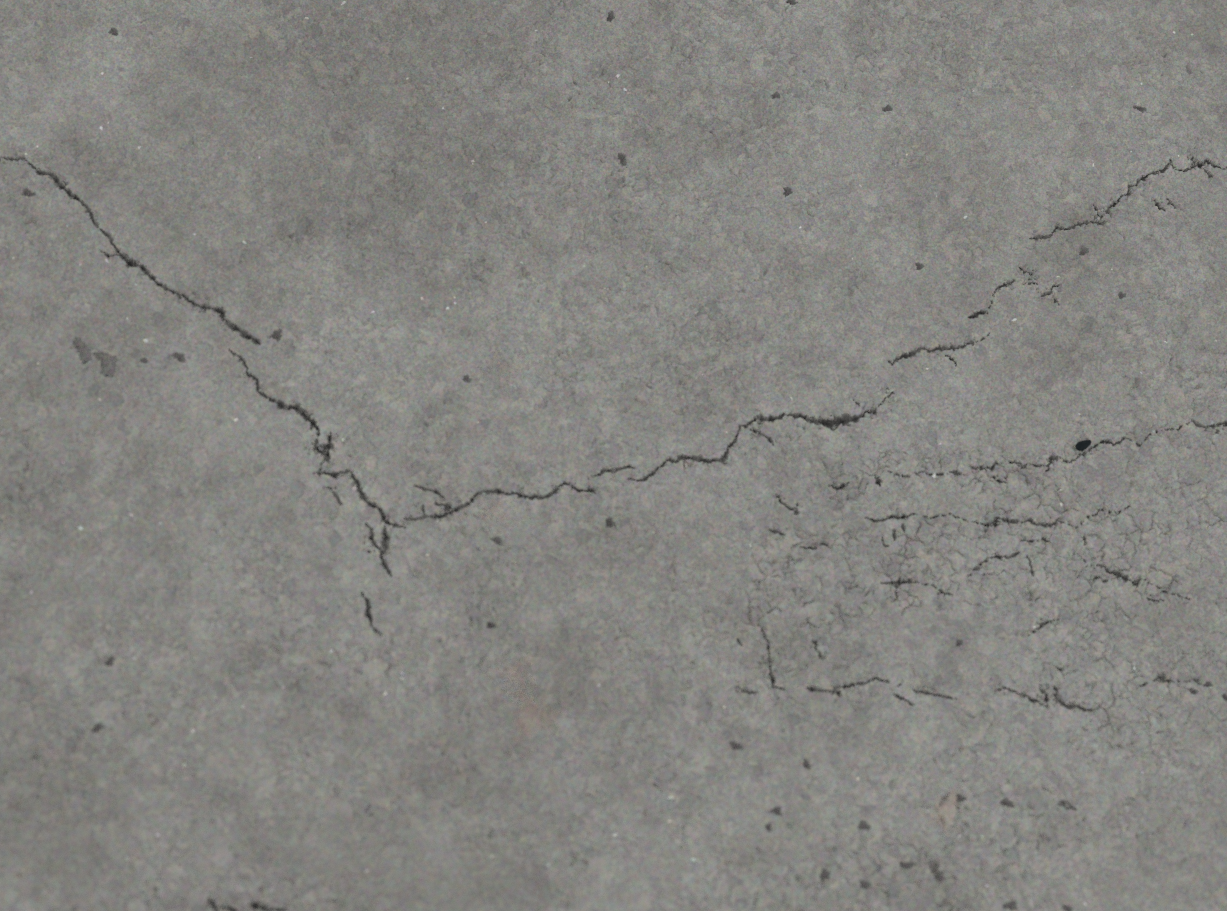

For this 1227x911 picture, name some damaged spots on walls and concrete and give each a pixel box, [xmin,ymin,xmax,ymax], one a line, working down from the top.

crack [1030,157,1227,240]
crack [4,156,1059,577]
crack [828,420,1227,491]
crack [866,505,1190,602]
crack [361,592,382,636]
crack [1028,619,1058,636]